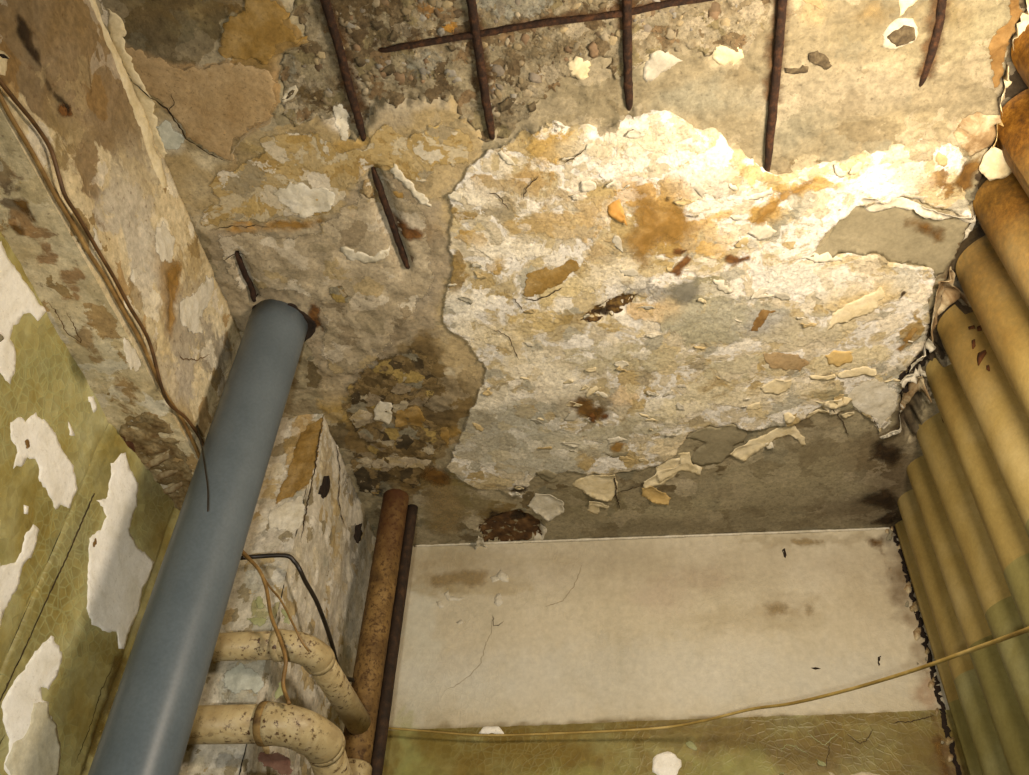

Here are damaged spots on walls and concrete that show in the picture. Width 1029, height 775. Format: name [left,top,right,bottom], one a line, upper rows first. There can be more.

crack [126,71,273,161]
rust [393,214,423,240]
peeling [200,0,1029,541]
water stain [628,197,698,276]
water stain [726,254,750,265]
peeling [0,505,39,626]
peeling [10,412,78,509]
peeling [87,412,193,649]
water stain [341,349,462,533]
rust [478,509,542,541]
water stain [863,490,897,524]
peeling [1,636,62,775]